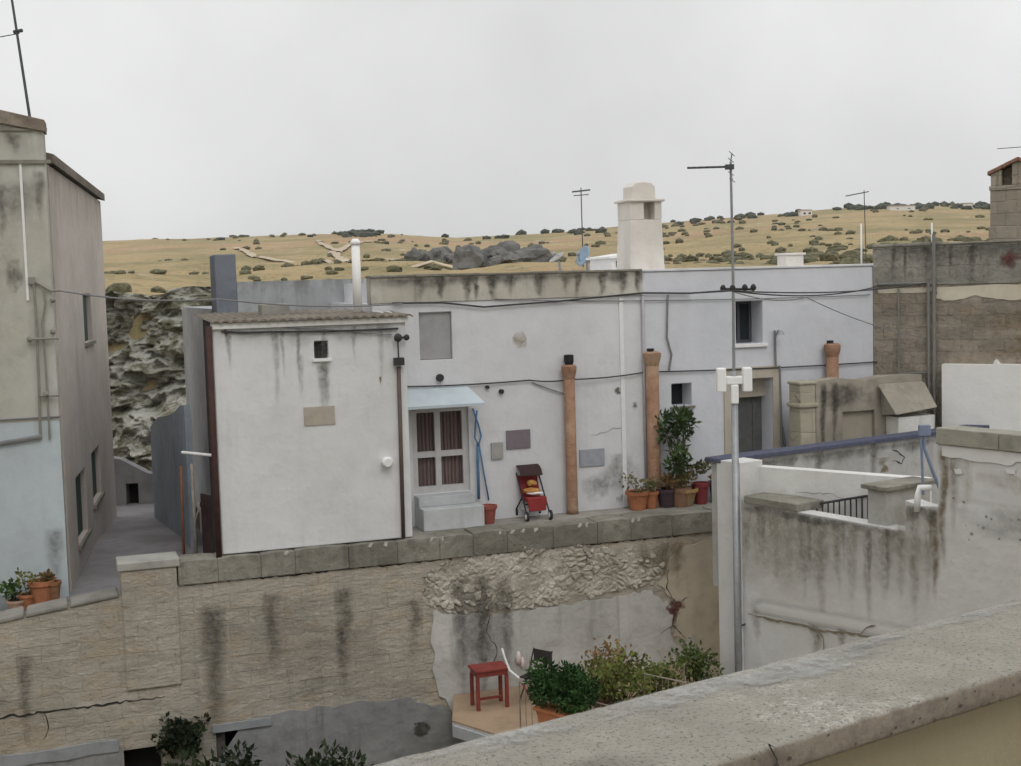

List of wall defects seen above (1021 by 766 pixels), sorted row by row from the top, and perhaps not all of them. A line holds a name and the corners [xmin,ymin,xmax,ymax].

water stain [465,276,512,293]
water stain [899,453,954,579]
flaking render [422,527,666,615]
crack [663,574,688,638]
crack [0,696,165,738]